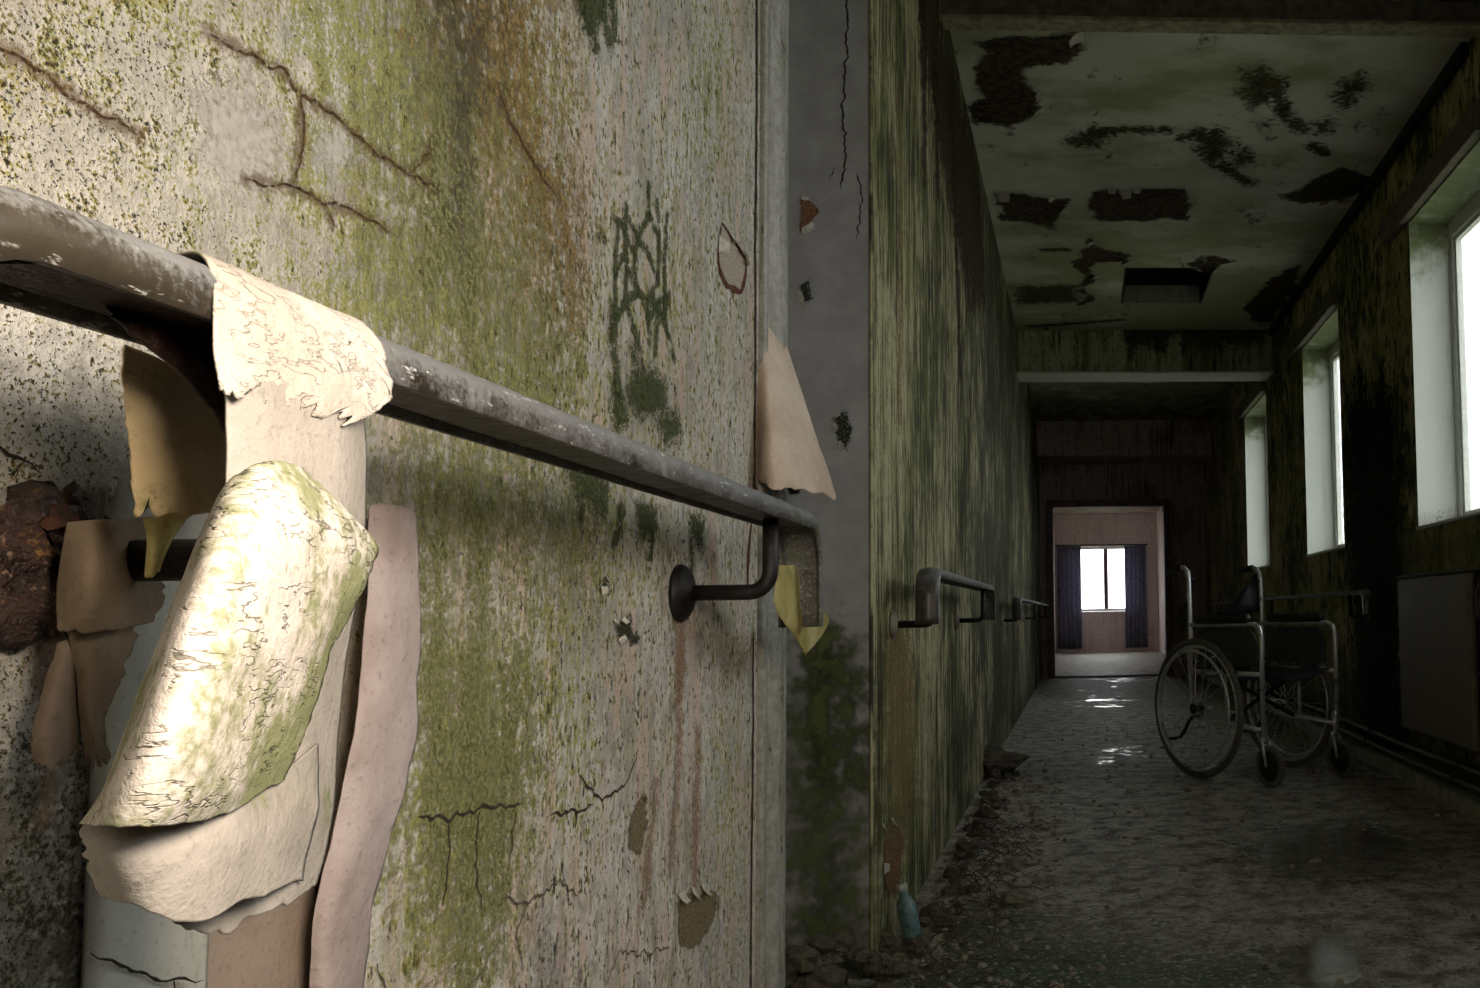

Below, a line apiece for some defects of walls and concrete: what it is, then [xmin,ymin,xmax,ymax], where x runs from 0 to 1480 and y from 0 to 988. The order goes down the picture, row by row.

crack [0,47,138,135]
flaking render [967,32,1084,130]
crack [211,34,443,232]
flaking render [993,187,1196,232]
flaking render [1277,167,1370,206]
flaking render [1070,238,1131,306]
peeling [830,409,853,452]
peeling [79,251,421,988]
leakage [414,504,527,988]
peeling [629,789,650,855]
peeling [677,883,722,948]
crack [90,953,203,988]